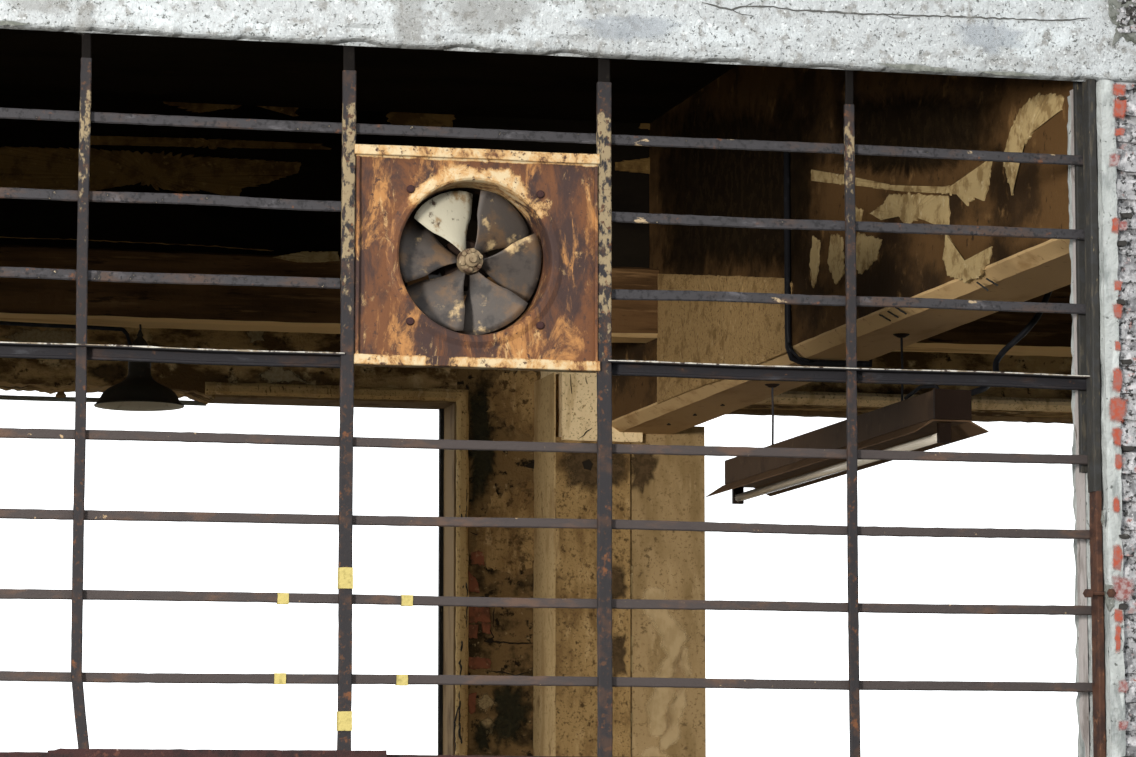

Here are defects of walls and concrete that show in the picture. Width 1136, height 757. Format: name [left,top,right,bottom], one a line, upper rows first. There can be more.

crack [702,2,1085,21]
spalling [1113,84,1127,136]
peeling [0,136,332,196]
peeling [809,93,1064,288]
spalling [1112,213,1133,247]
spalling [1113,281,1126,318]
water stain [88,363,128,383]
spalling [1110,341,1135,469]
water stain [469,389,495,505]
spalling [1101,498,1120,527]
spalling [1104,534,1134,651]
mould [473,685,527,750]